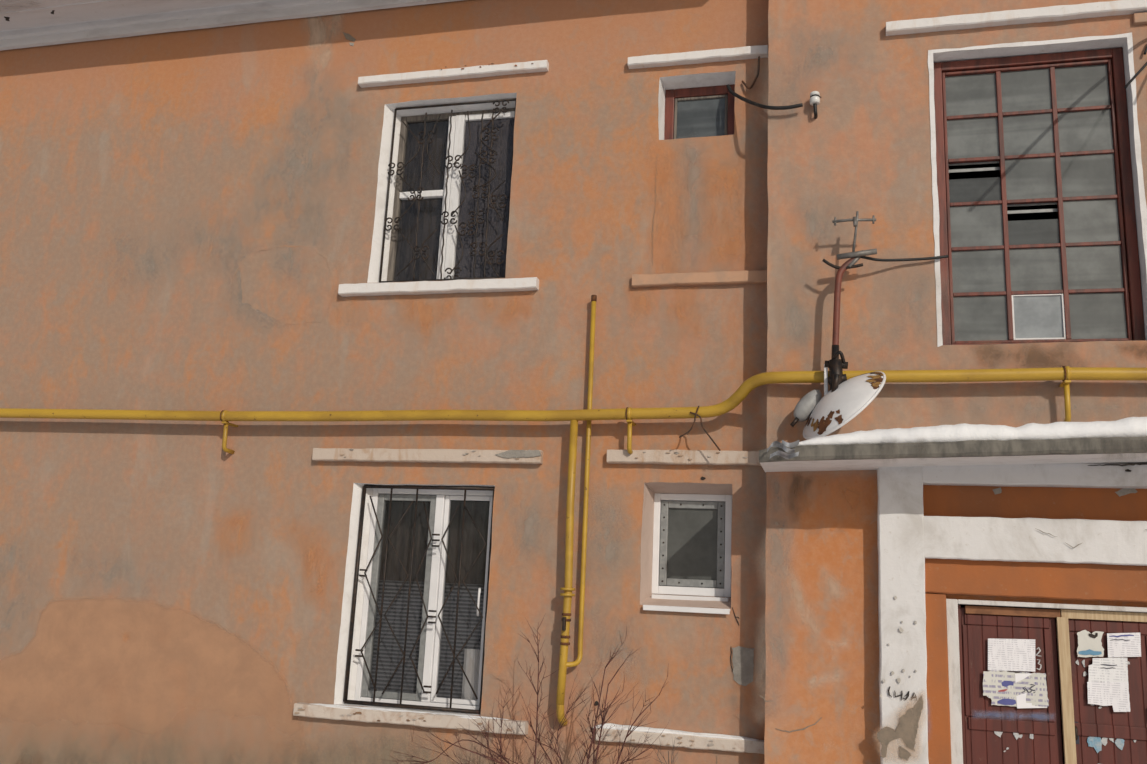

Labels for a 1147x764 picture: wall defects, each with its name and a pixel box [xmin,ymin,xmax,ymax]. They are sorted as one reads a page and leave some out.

damp [1017,347,1069,368]
flaking render [730,646,755,686]
peeling [877,696,923,761]